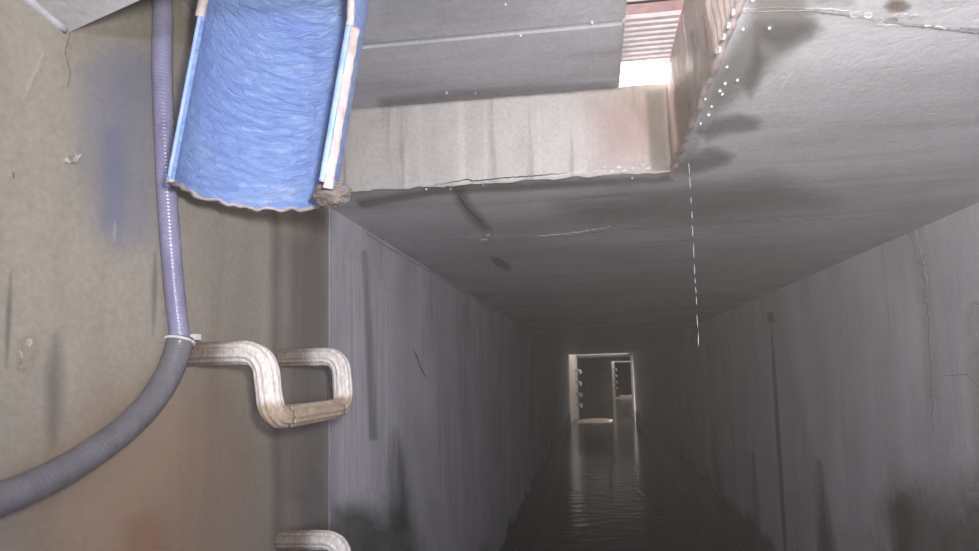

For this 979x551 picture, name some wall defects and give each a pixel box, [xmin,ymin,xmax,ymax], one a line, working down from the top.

damp [670,0,738,157]
damp [712,0,809,102]
crack [742,7,979,36]
crack [436,173,563,185]
crack [384,218,979,433]
damp [635,313,787,551]
damp [894,498,979,551]